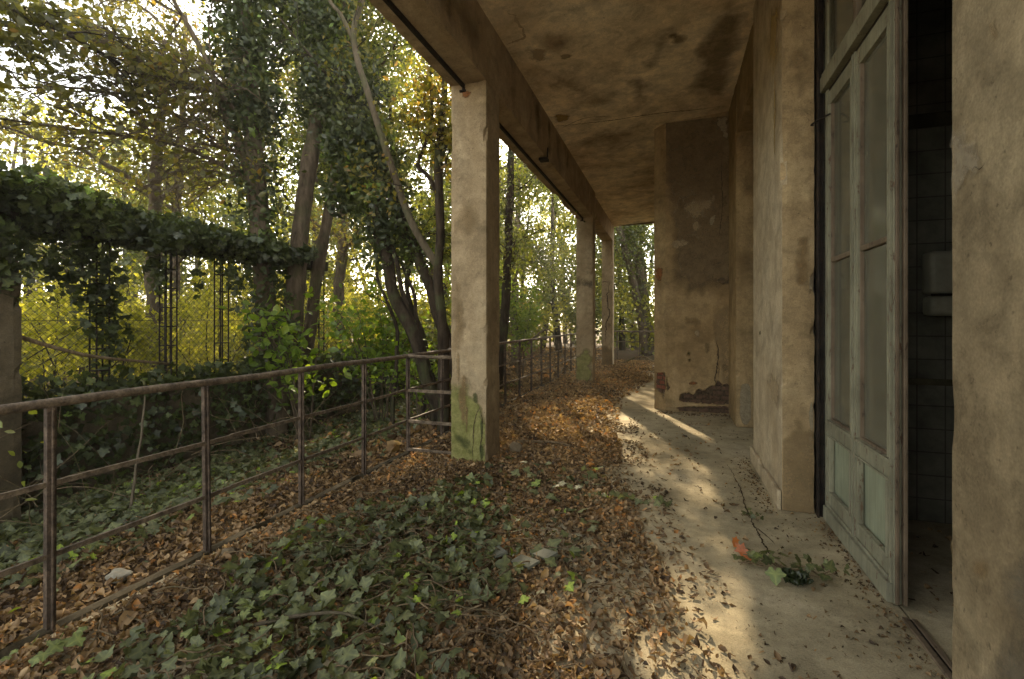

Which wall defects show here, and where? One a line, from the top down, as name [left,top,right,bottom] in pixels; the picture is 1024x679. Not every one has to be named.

spalling [656,372,670,397]
spalling [678,381,729,413]
crack [727,465,774,554]